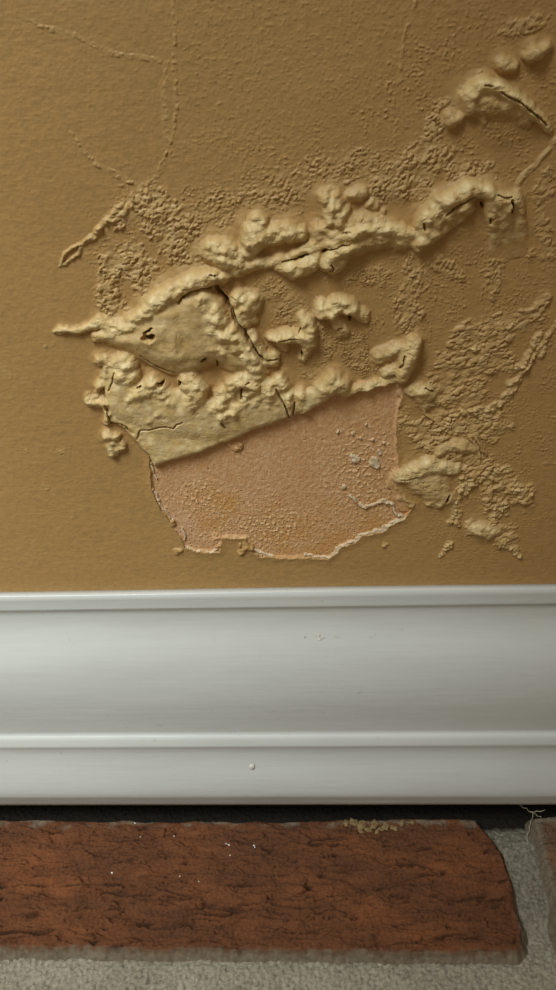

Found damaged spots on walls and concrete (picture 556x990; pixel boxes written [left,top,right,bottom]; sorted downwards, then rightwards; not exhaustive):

spalling [84,351,479,559]